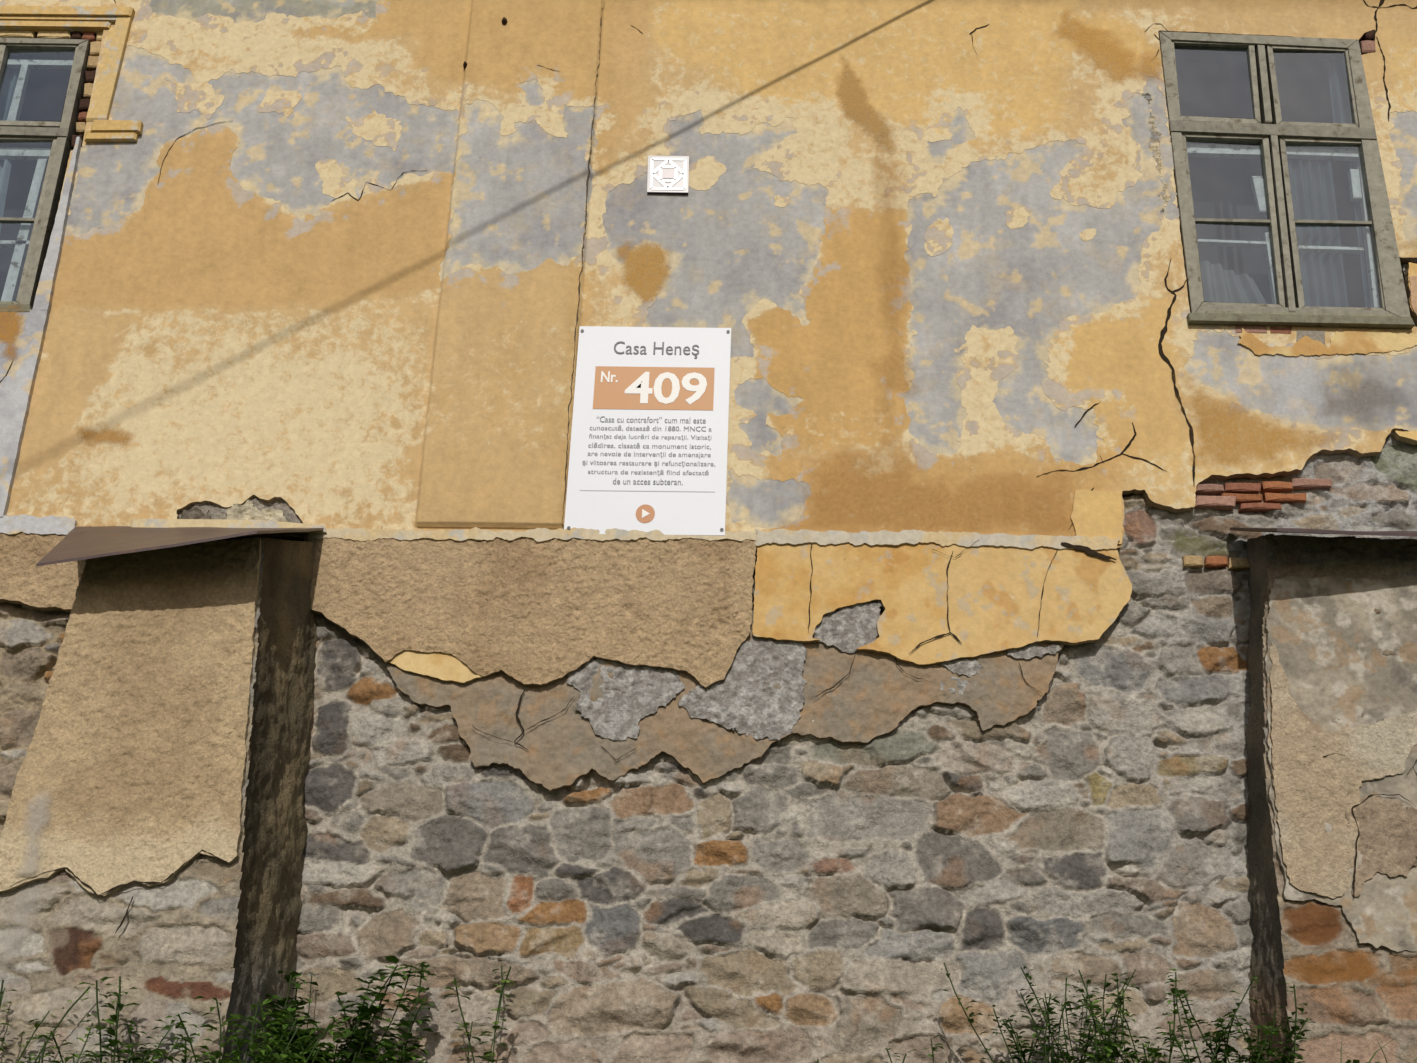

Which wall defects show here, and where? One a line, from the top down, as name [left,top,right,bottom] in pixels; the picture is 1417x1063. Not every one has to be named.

peeling [0,30,829,358]
leakage [839,66,892,149]
peeling [904,74,1179,465]
peeling [1184,111,1417,445]
crack [1364,0,1417,121]
crack [1037,259,1195,491]
flaking render [1194,478,1332,513]
crack [472,691,573,750]
spalling [380,601,1064,793]
crack [894,541,977,683]
crack [1018,523,1116,693]
spalling [1269,643,1417,899]